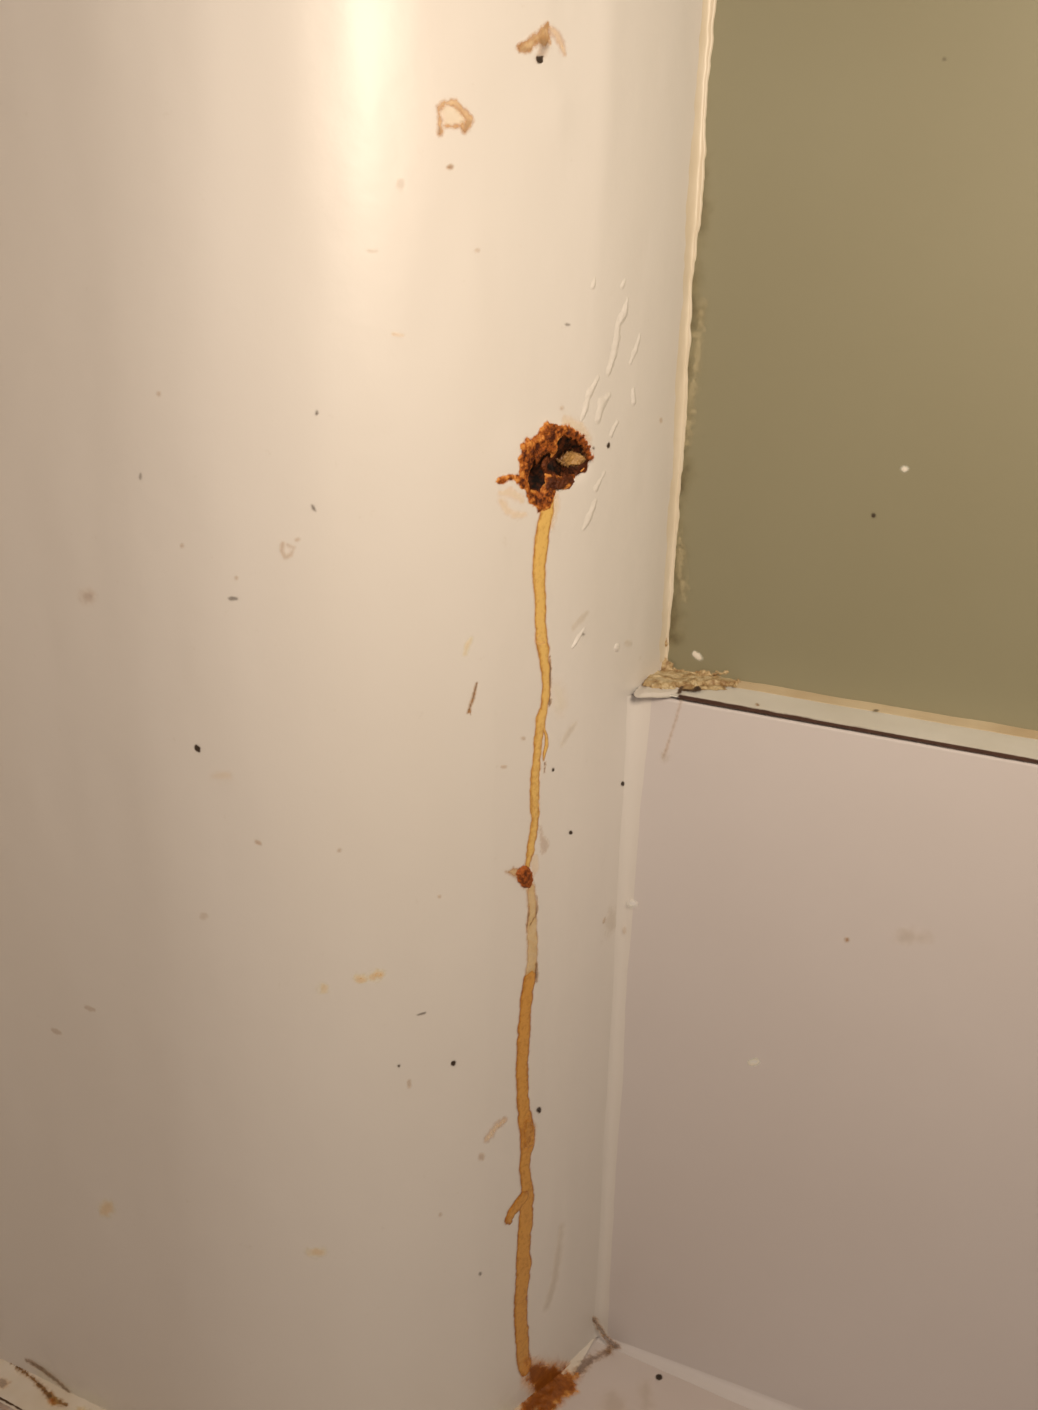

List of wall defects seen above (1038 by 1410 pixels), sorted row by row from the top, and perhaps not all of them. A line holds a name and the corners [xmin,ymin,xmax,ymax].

peeling [517,22,550,63]
hole [528,433,591,492]